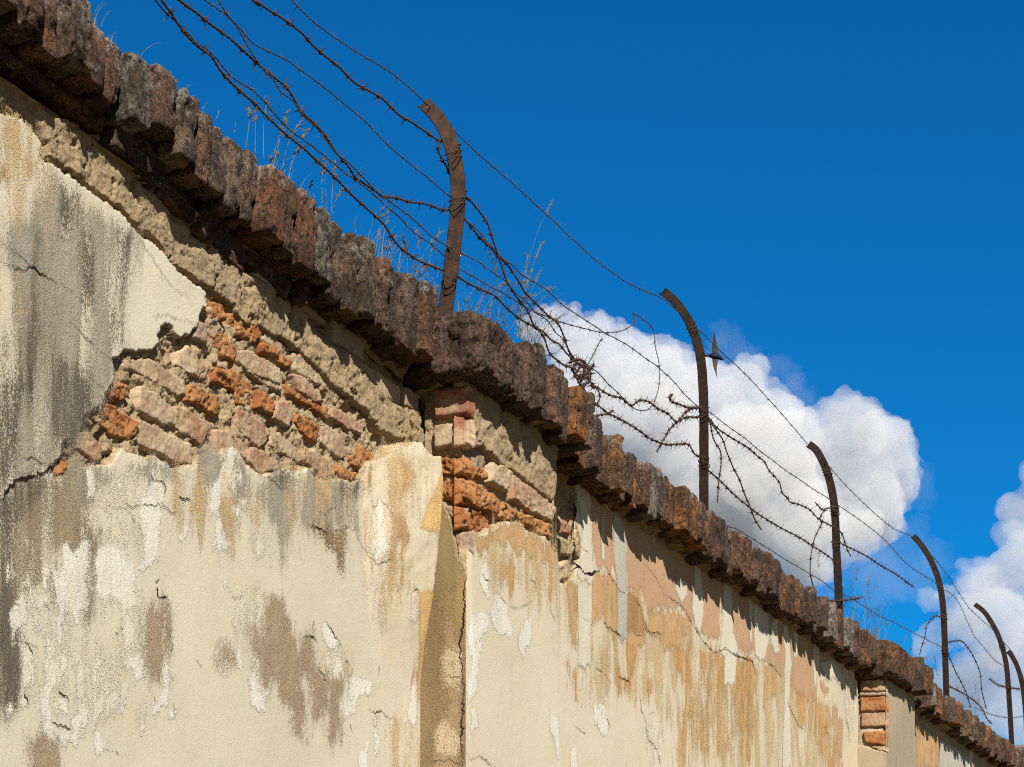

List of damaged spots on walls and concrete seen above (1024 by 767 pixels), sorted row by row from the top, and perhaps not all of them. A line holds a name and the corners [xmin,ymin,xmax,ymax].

crack [1,243,72,291]
crack [1,456,56,500]
water stain [0,165,365,731]
spalling [0,284,395,767]
crack [433,557,555,766]
water stain [577,491,628,669]
peeling [433,385,889,767]
water stain [675,565,705,634]
water stain [720,583,739,687]
water stain [748,598,799,767]
water stain [813,644,844,690]